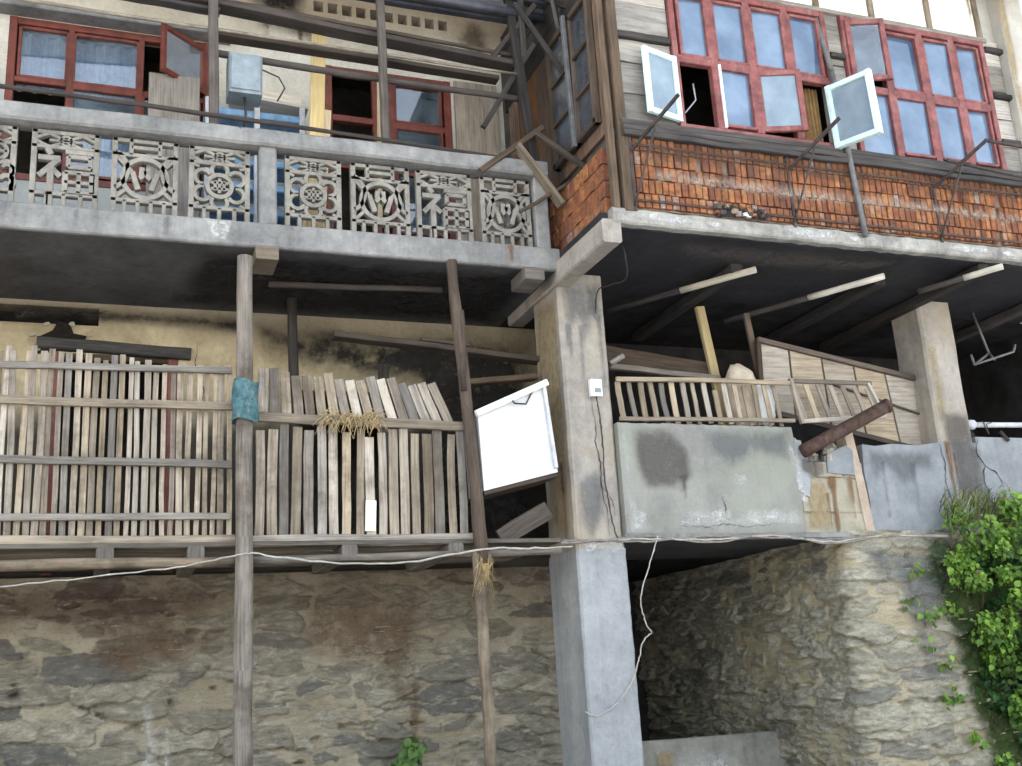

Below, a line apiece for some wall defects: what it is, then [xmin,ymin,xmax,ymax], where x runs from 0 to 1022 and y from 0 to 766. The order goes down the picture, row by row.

water stain [638,435,688,490]
spalling [790,438,855,501]
rust [945,441,958,489]
rust [827,476,840,529]